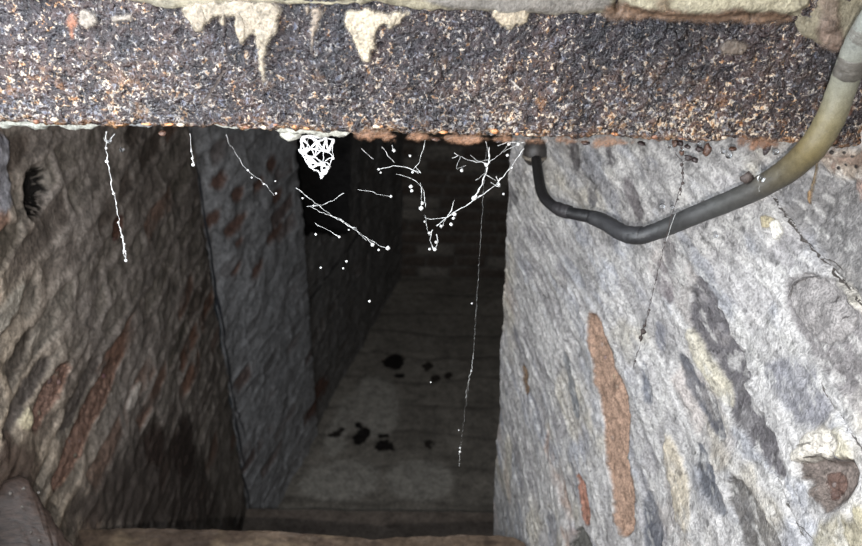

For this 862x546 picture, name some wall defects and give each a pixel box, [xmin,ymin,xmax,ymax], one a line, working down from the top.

rust [604,0,792,24]
rust [818,18,844,52]
rust [142,123,185,136]
rust [358,125,394,141]
rust [409,128,481,145]
rust [490,129,534,143]
rust [672,133,712,163]
rust [721,133,778,156]
crack [771,196,862,306]
leakage [381,354,405,378]
crack [821,383,862,451]
leakage [353,422,394,451]